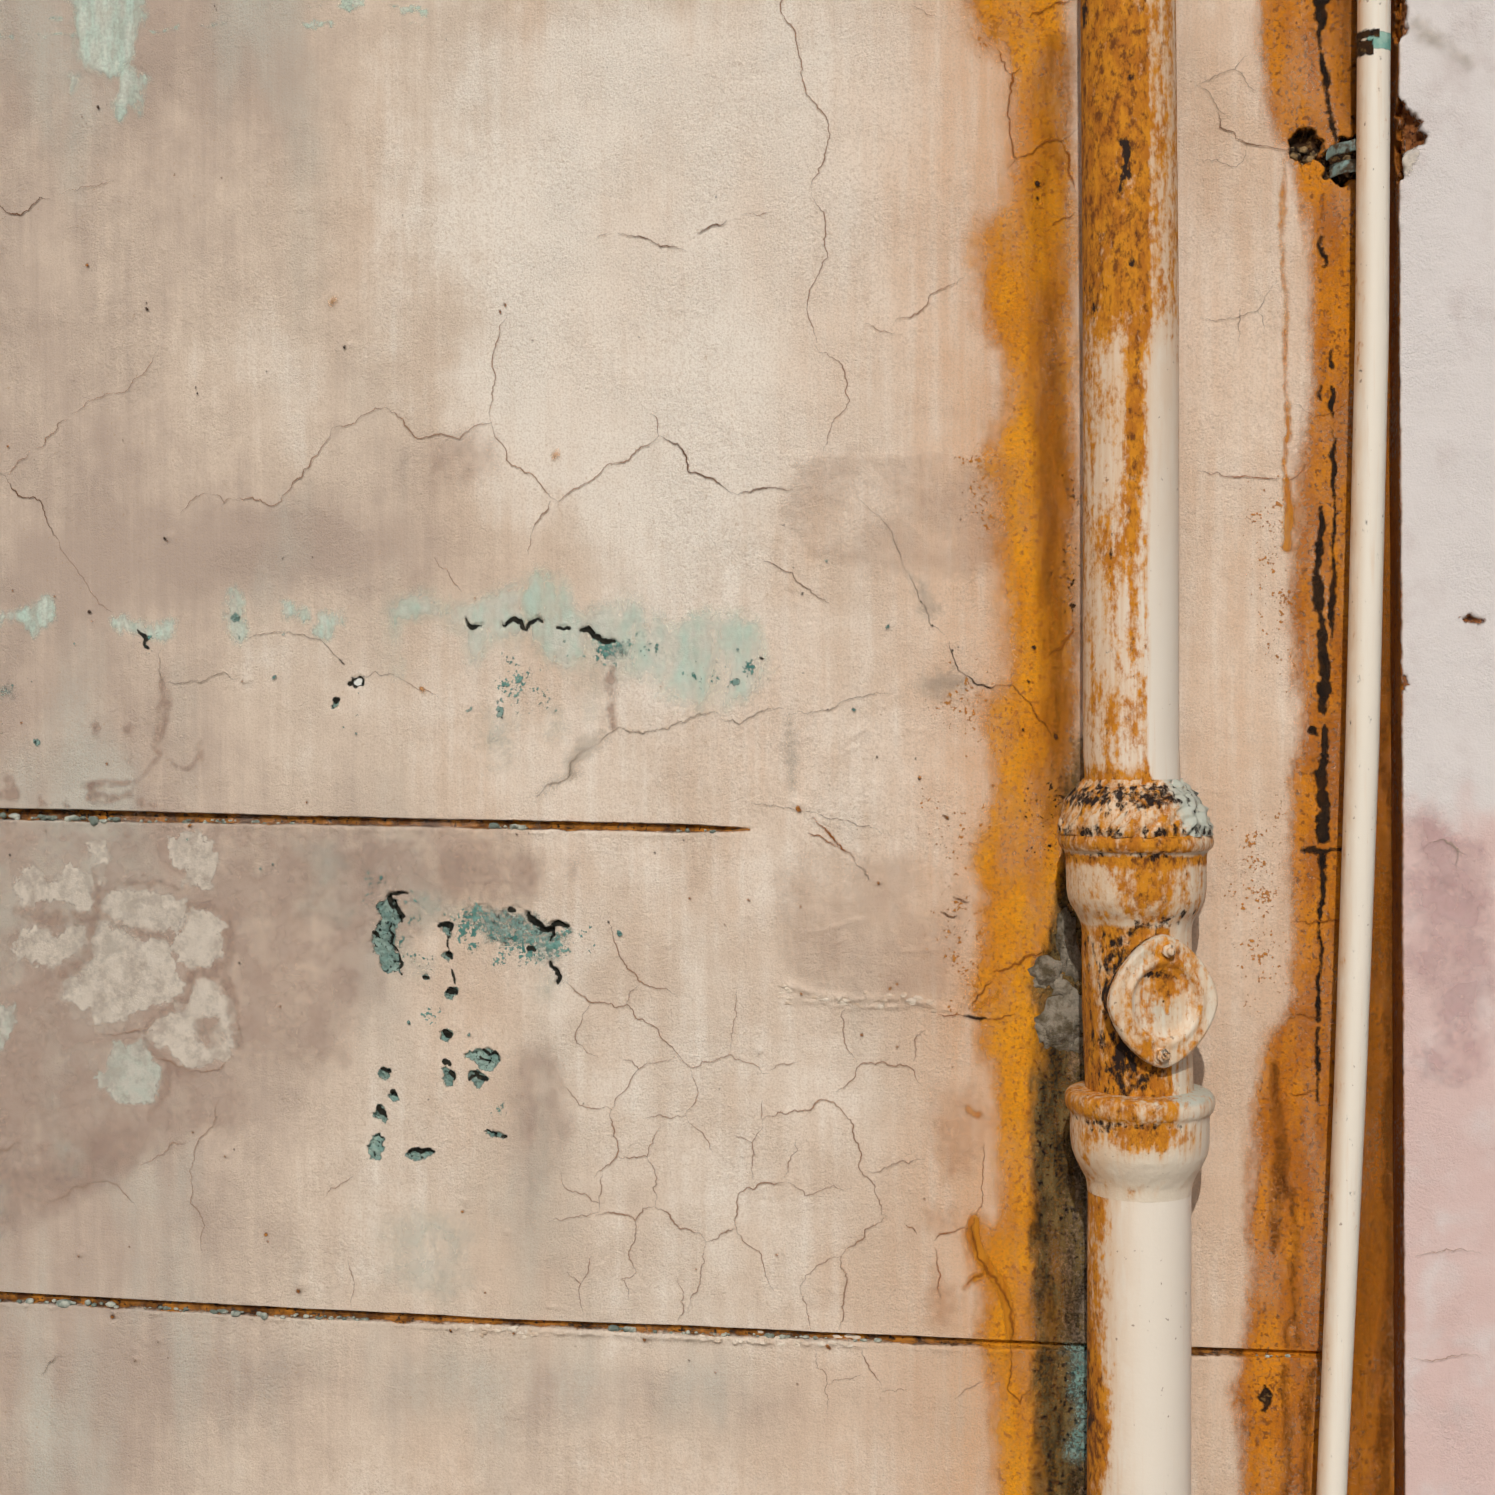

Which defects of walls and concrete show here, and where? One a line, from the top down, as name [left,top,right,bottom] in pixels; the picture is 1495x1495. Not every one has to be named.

crack [780,0,850,438]
spalling [367,1067,399,1160]
spalling [405,1147,435,1161]
spalling [362,871,595,1089]
crack [184,322,785,549]
peeling [461,574,764,718]
crack [556,938,1036,1404]
rust [920,0,1077,1495]
damp [1024,740,1084,1014]
damp [1029,1031,1088,1495]
damp [1047,460,1080,613]
rust [1221,0,1357,1495]